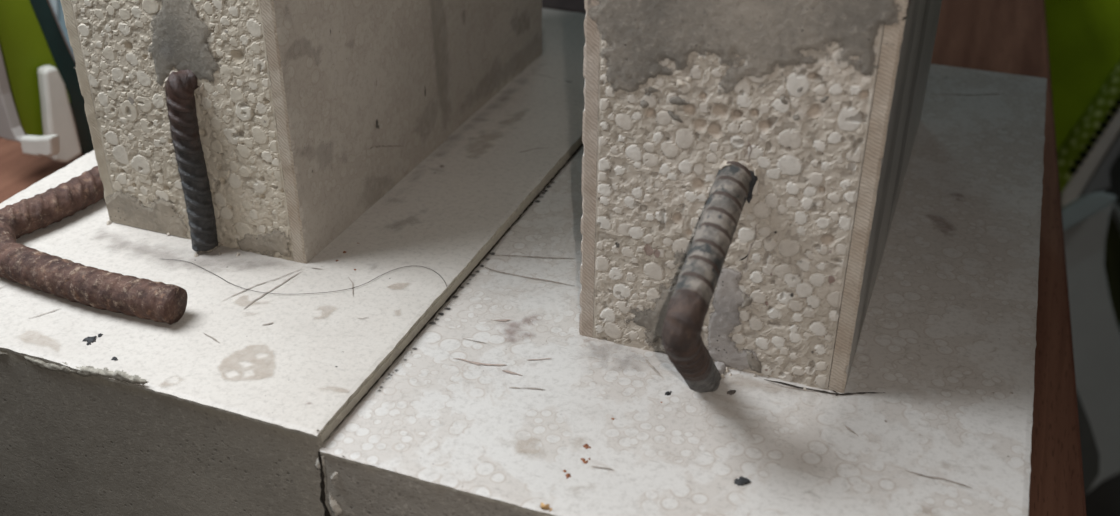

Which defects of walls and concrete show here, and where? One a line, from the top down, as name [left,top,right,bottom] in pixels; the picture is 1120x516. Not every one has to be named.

peeling [668,72,692,123]
spalling [719,160,761,203]
crack [318,143,583,516]
peeling [714,350,769,394]